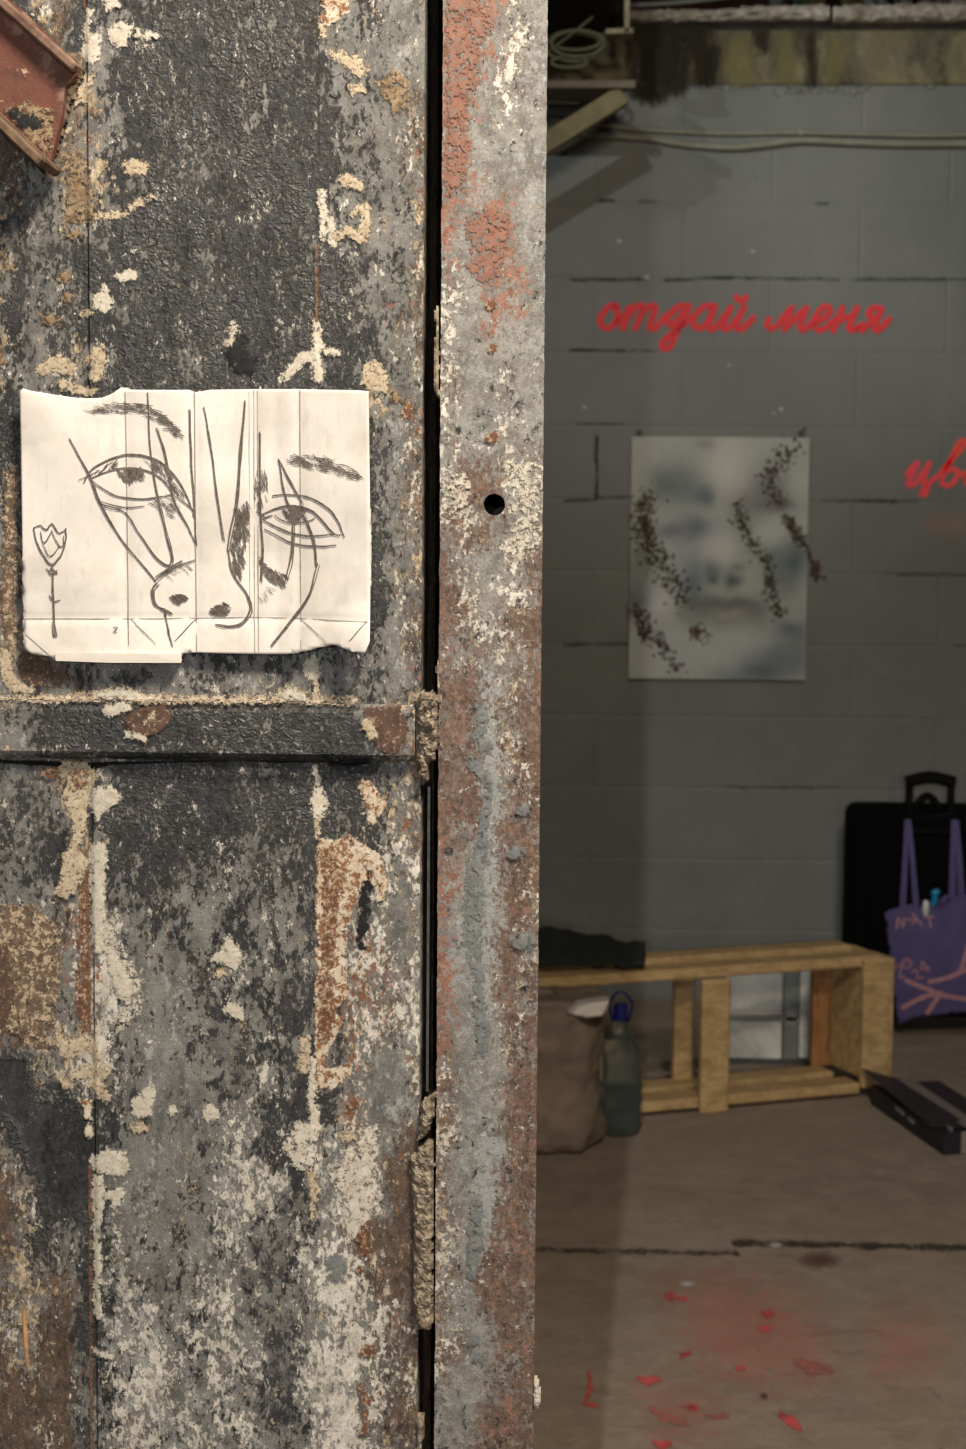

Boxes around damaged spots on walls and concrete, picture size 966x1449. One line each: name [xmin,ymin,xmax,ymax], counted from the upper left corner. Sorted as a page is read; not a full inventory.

peeling [74,0,160,106]
corrosion [443,0,500,197]
leakage [623,22,720,106]
leakage [805,30,819,87]
peeling [277,173,372,383]
corrosion [462,204,515,312]
corrosion [484,430,502,443]
corrosion [0,851,93,1050]
peeling [39,759,146,1035]
peeling [278,764,390,1239]
peeling [54,1032,130,1320]
crack [535,1239,966,1256]